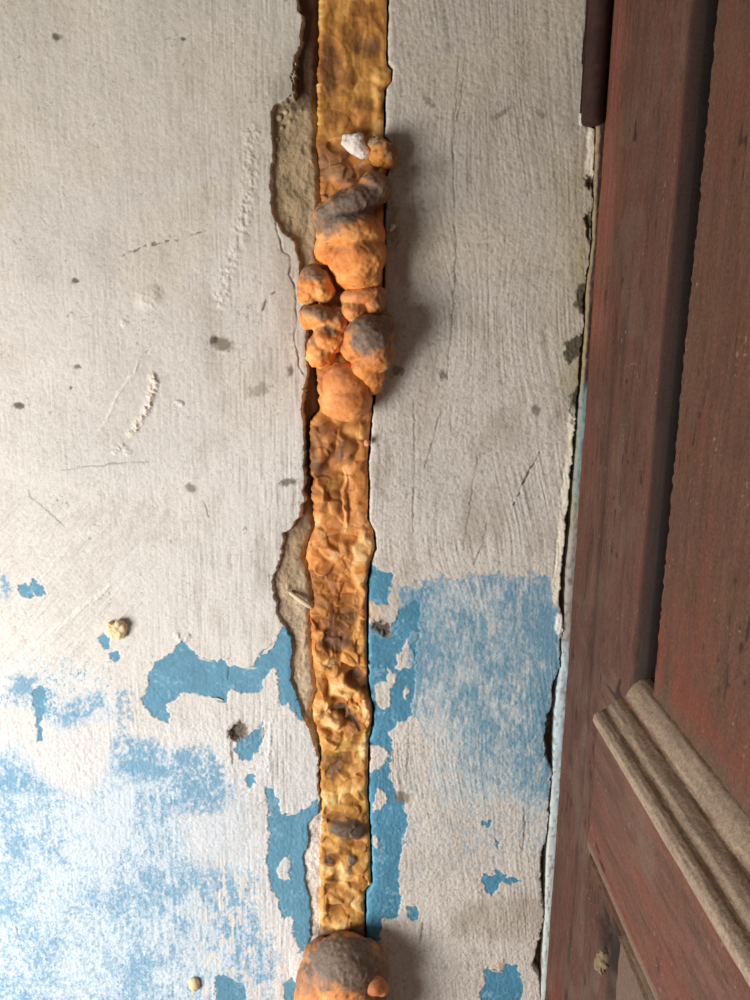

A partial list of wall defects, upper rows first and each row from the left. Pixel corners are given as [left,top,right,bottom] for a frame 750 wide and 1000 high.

flaking render [269,0,321,273]
peeling [16,576,49,600]
peeling [94,629,125,666]
peeling [138,330,323,958]
peeling [29,681,52,747]
peeling [365,560,425,946]
peeling [479,817,502,853]
peeling [479,867,524,893]
peeling [212,973,250,1000]
peeling [280,973,297,1000]
peeling [476,960,528,1000]